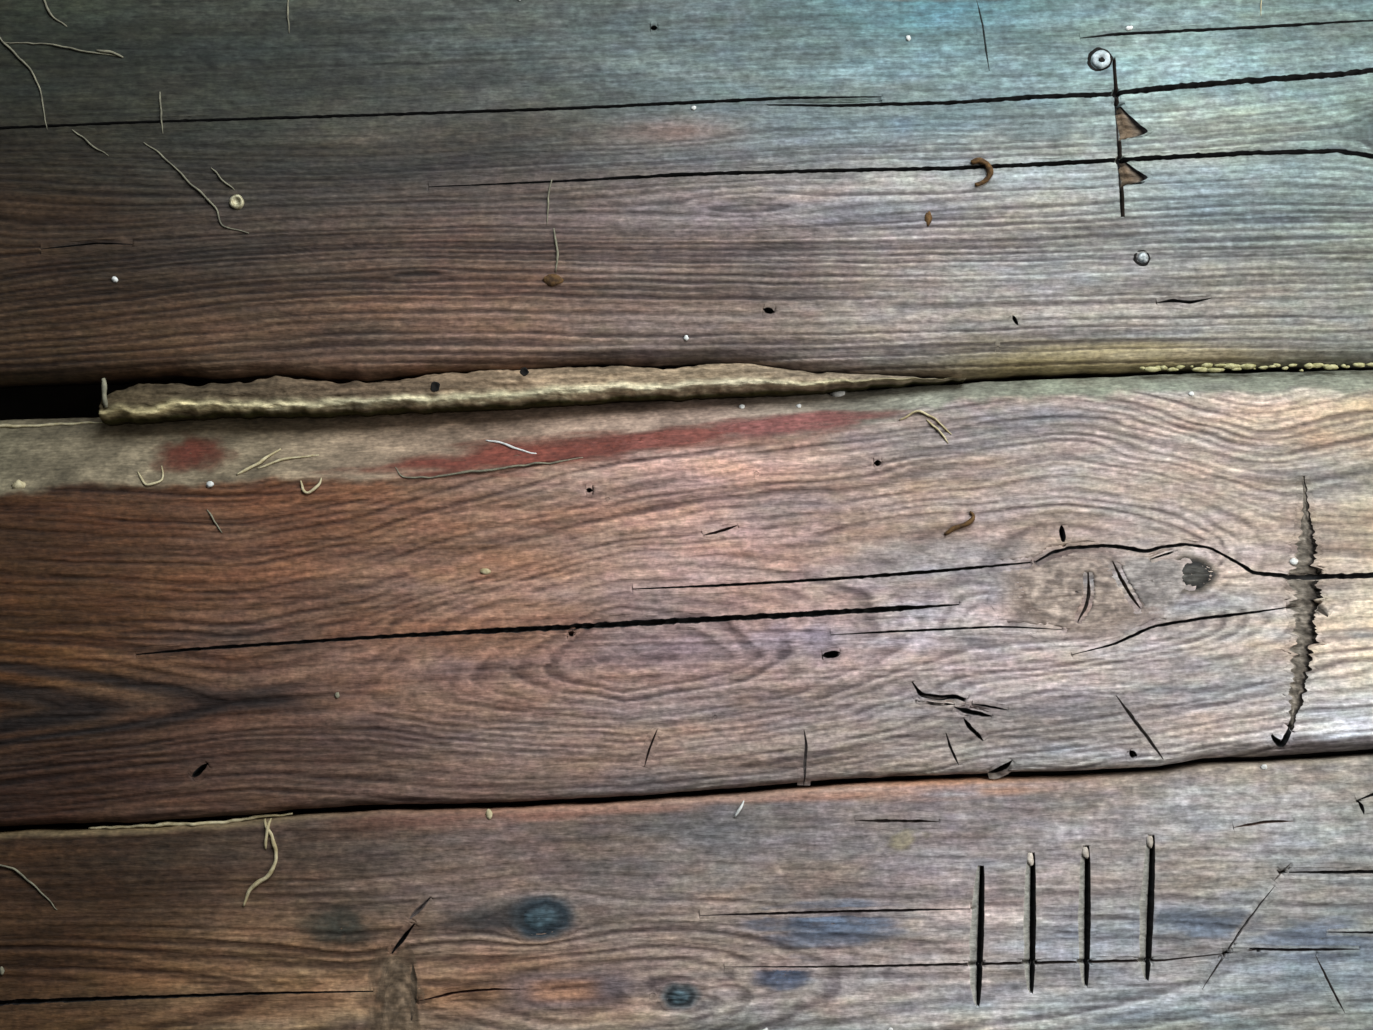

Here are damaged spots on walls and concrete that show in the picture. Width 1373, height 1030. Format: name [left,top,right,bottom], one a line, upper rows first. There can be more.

crack [1080,14,1373,44]
crack [0,62,1373,136]
crack [429,142,1373,193]
water stain [548,411,878,454]
crack [136,537,1373,661]
crack [699,902,970,922]
crack [724,925,1373,974]